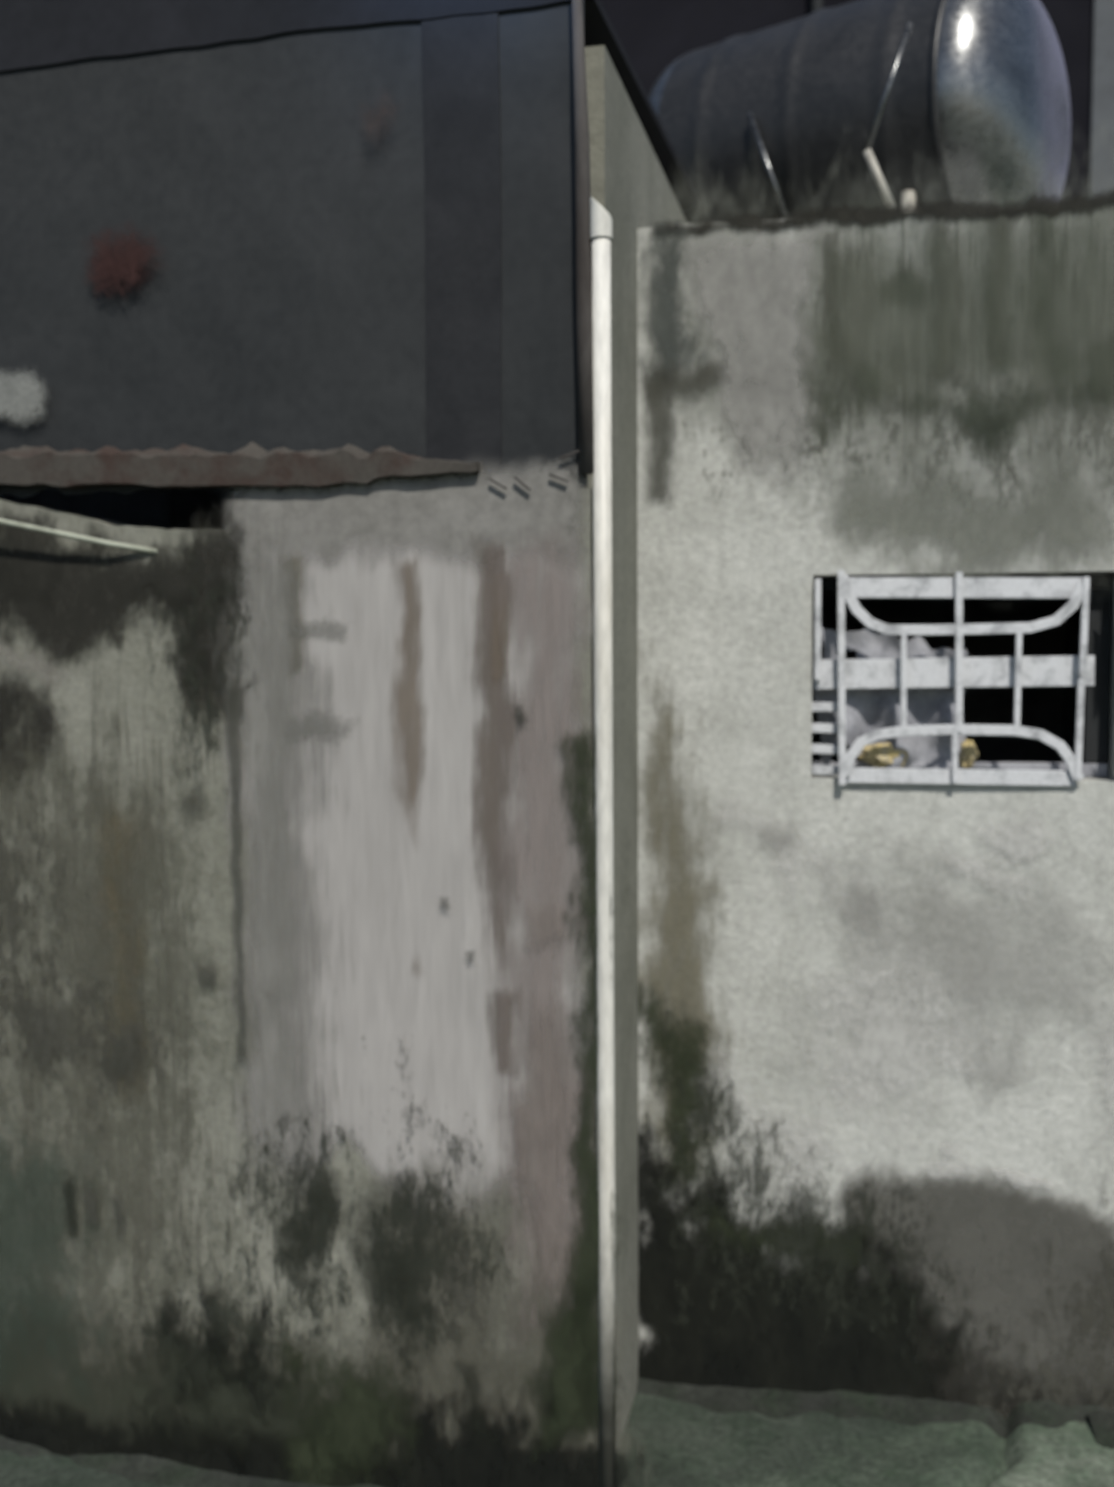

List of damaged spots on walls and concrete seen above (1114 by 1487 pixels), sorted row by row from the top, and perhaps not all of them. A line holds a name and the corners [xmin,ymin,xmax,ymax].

damp [646,190,1114,498]
damp [0,514,644,1487]
damp [637,712,1114,1418]